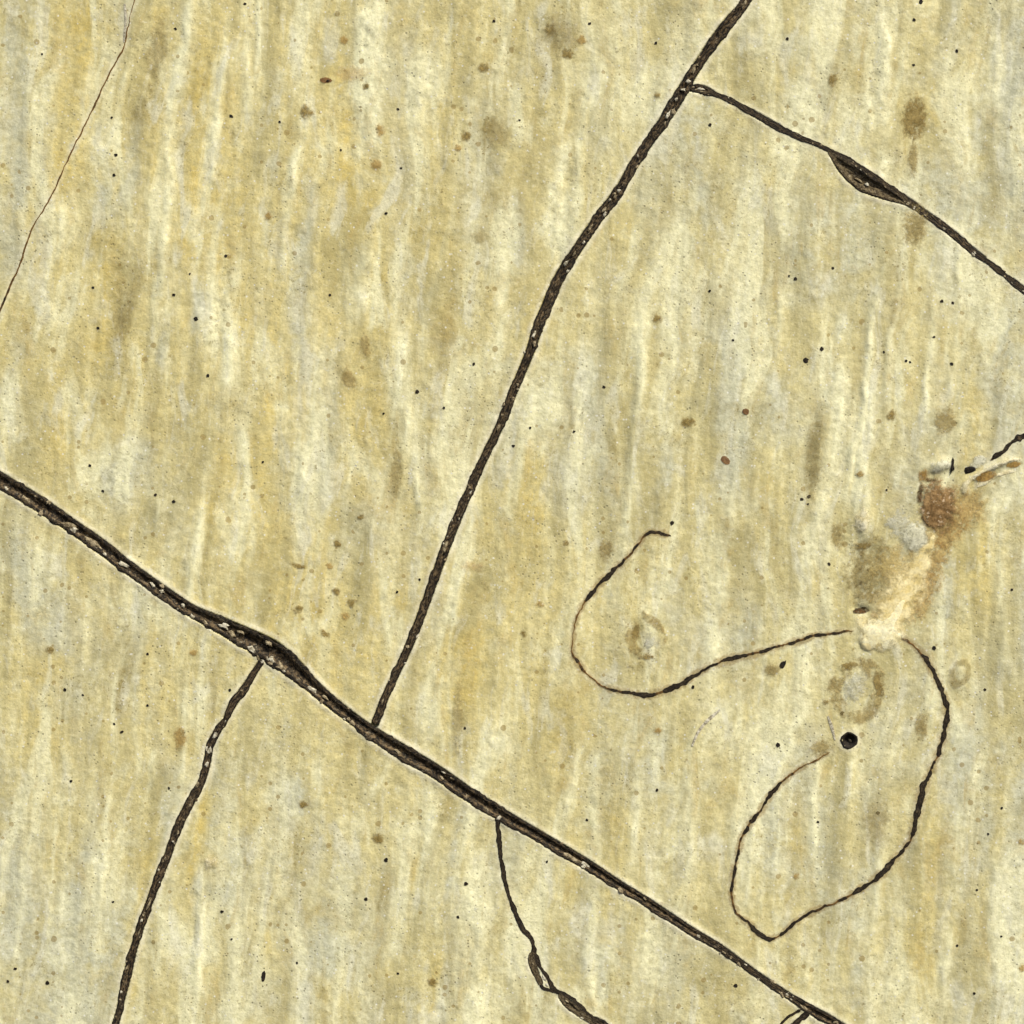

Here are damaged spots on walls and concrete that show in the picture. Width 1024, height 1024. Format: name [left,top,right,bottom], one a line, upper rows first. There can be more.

crack [0,0,135,312]
crack [372,0,1024,724]
leakage [832,525,843,547]
crack [0,472,844,1024]
crack [730,636,950,942]